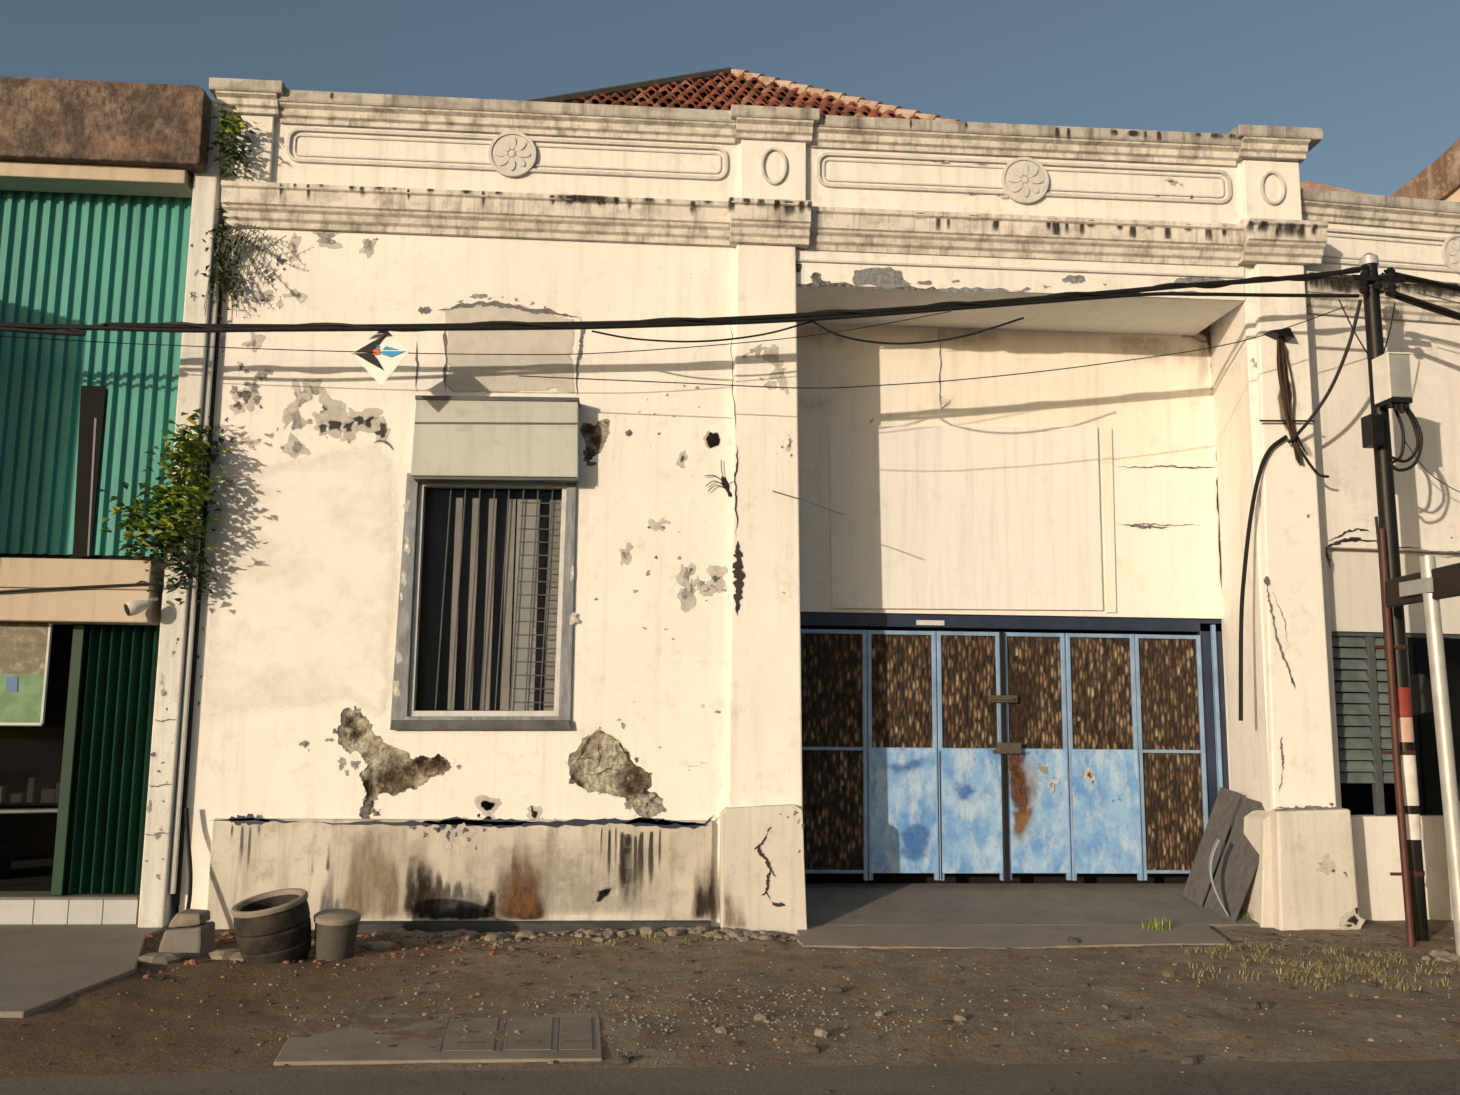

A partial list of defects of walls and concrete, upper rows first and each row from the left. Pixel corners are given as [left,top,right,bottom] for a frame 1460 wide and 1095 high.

water stain [550,195,669,208]
water stain [690,197,812,213]
peeling [210,332,391,491]
flaking render [580,385,701,468]
crack [730,331,746,615]
crack [1117,458,1222,587]
crack [1325,528,1460,567]
flaking render [299,706,461,819]
flaking render [565,719,666,818]
rust [992,665,1031,833]
water stain [321,827,661,919]
crack [754,827,786,907]